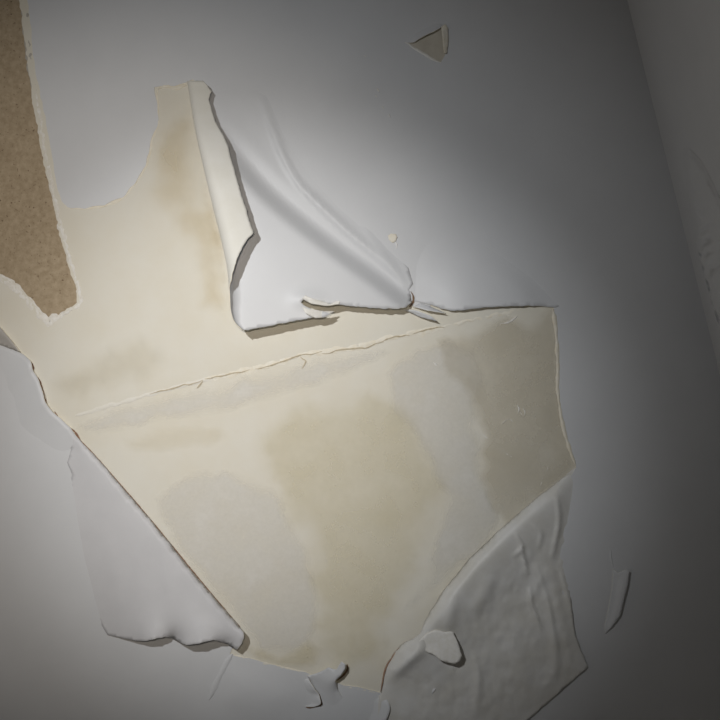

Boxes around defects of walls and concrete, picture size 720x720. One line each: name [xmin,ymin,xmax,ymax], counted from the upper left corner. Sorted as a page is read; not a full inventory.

peeling [0,0,576,708]
crack [75,309,521,417]